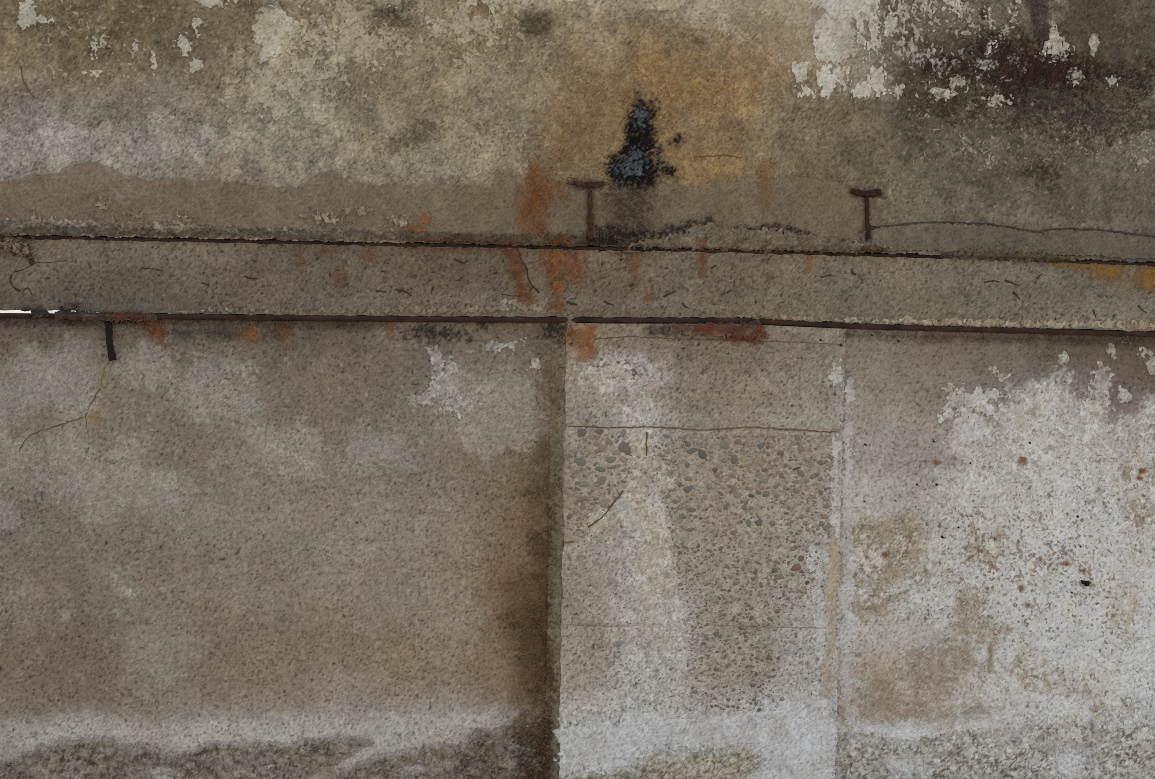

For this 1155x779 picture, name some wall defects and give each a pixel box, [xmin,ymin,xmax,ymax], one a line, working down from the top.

peeling [2,0,590,185]
peeling [610,0,1155,185]
water stain [1015,88,1155,148]
corrosion [515,163,587,311]
crack [0,362,109,465]
water stain [404,342,483,419]
water stain [477,337,541,430]
corrosion [665,316,767,364]
water stain [63,463,193,510]
spalling [552,305,1155,779]
water stain [858,629,974,723]